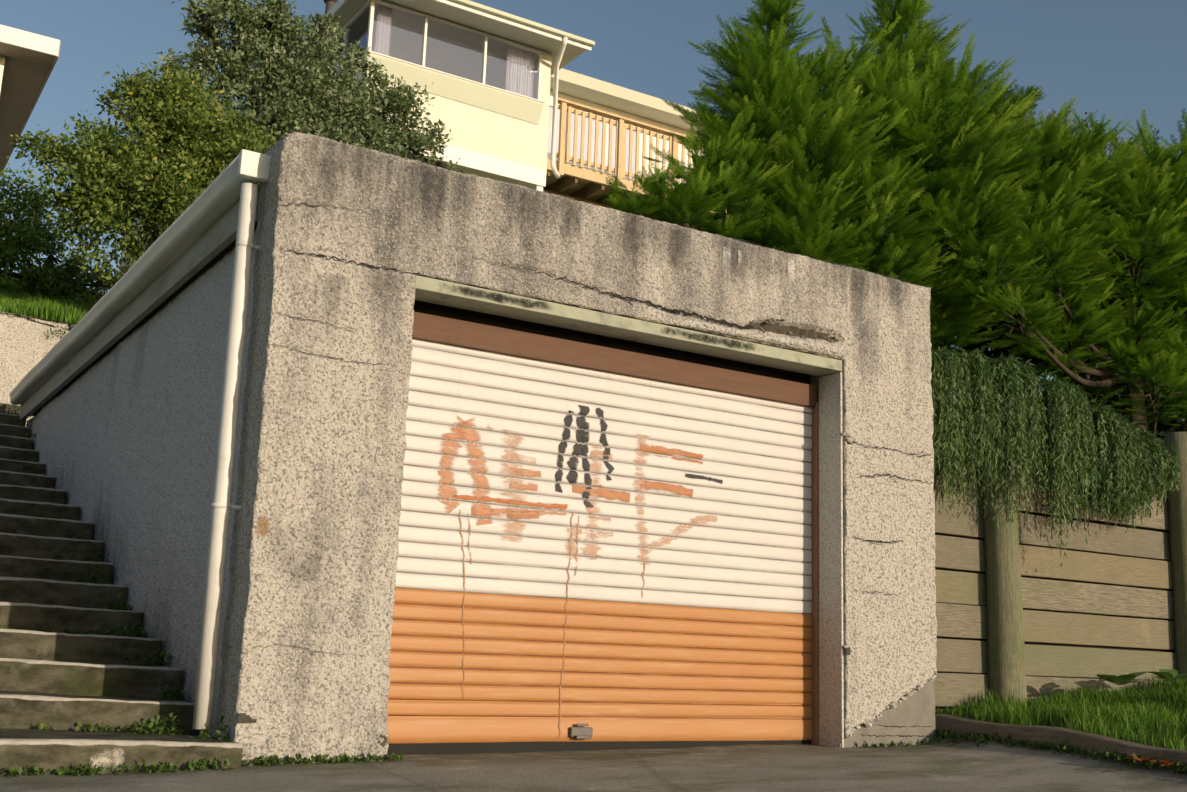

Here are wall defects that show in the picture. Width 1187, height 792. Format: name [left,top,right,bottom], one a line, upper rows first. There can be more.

crack [278,248,422,275]
crack [463,257,754,329]
flaking render [749,317,838,343]
crack [852,441,933,484]
crack [855,536,903,544]